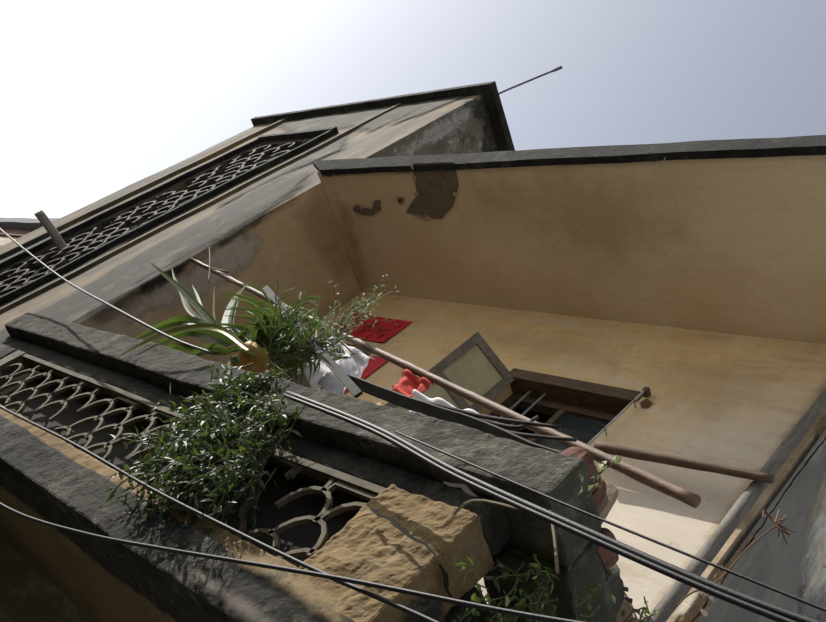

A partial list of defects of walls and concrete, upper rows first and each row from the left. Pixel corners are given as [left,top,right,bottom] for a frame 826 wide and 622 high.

water stain [34,94,498,324]
spalling [351,200,381,216]
spalling [406,162,459,222]
crack [370,508,452,598]
crack [691,436,826,622]